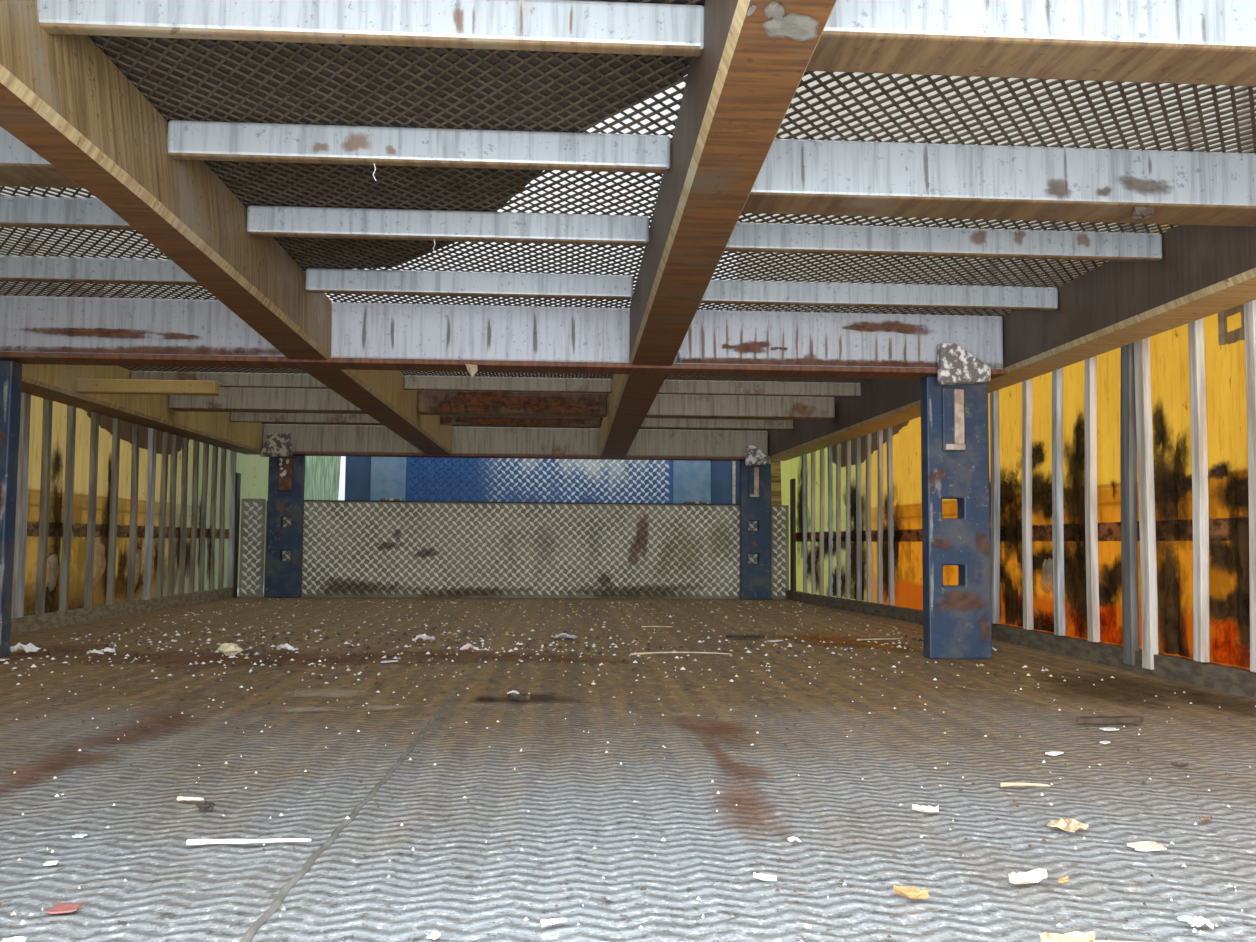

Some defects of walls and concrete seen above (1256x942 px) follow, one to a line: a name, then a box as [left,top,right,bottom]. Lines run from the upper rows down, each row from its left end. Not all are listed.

peeling [747,2,817,41]
corrosion [0,328,280,355]
corrosion [676,321,937,367]
corrosion [430,391,599,426]
corrosion [938,593,990,639]
corrosion [690,723,763,775]
corrosion [727,794,761,820]